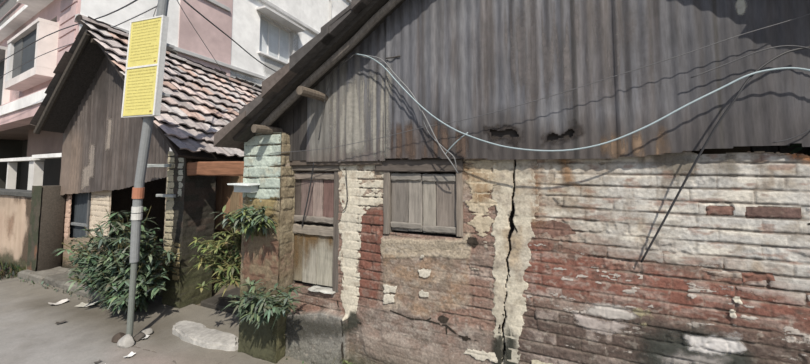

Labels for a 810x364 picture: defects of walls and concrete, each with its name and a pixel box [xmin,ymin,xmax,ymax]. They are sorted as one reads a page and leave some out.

peeling [338,165,384,321]
crack [498,159,518,349]
peeling [464,151,810,364]
water stain [285,312,359,338]
crack [390,310,476,341]
water stain [573,303,636,334]
water stain [644,330,751,364]